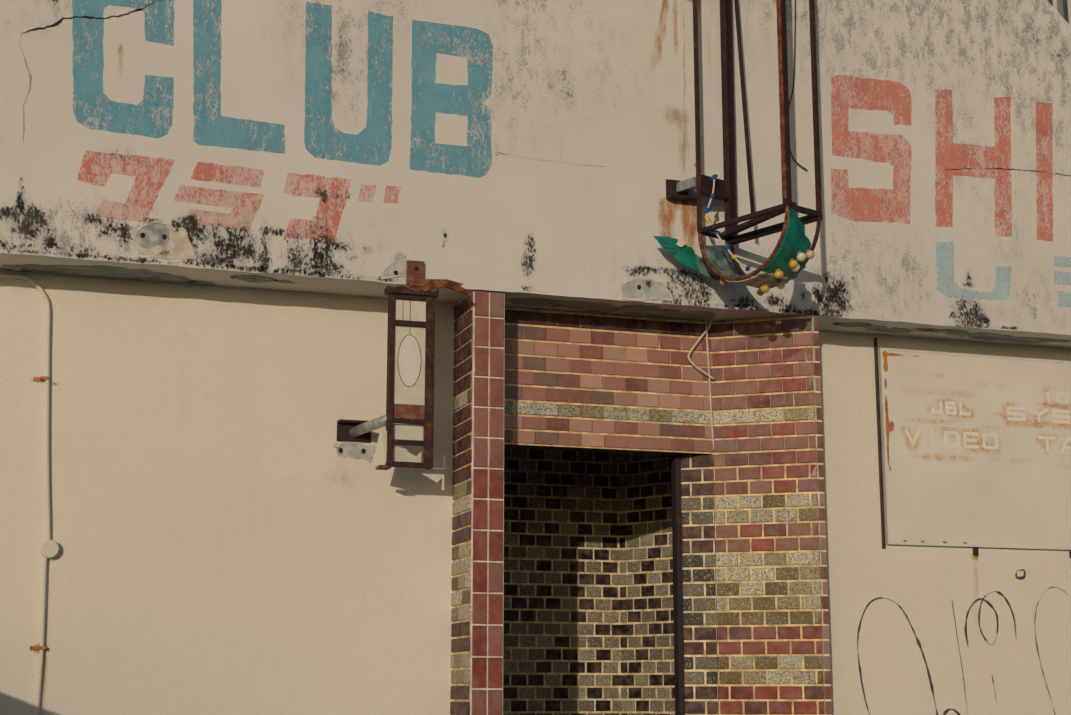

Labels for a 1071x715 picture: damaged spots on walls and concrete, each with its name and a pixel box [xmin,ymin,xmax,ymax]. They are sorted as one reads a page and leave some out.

crack [19,0,158,136]
crack [947,167,1071,176]
water stain [0,178,171,264]
peeling [2,264,215,286]
spalling [136,220,196,260]
water stain [172,214,369,279]
water stain [522,235,536,290]
water stain [626,265,712,307]
rust [661,200,697,237]
water stain [725,273,860,317]
water stain [947,274,1018,330]